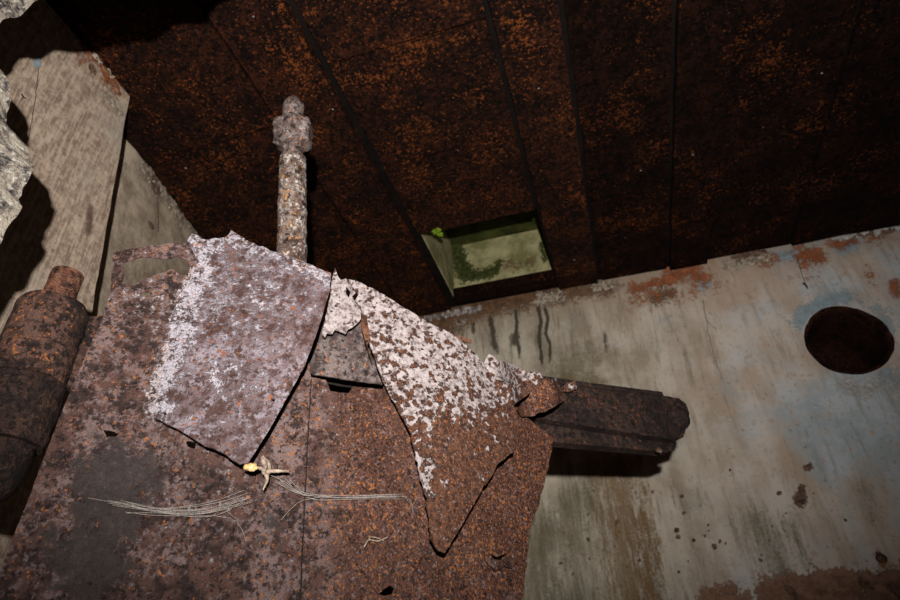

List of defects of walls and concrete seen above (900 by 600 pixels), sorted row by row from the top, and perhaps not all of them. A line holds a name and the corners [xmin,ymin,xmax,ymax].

rust [785,244,827,280]
rust [625,265,716,307]
rust [889,278,900,298]
water stain [419,280,623,365]